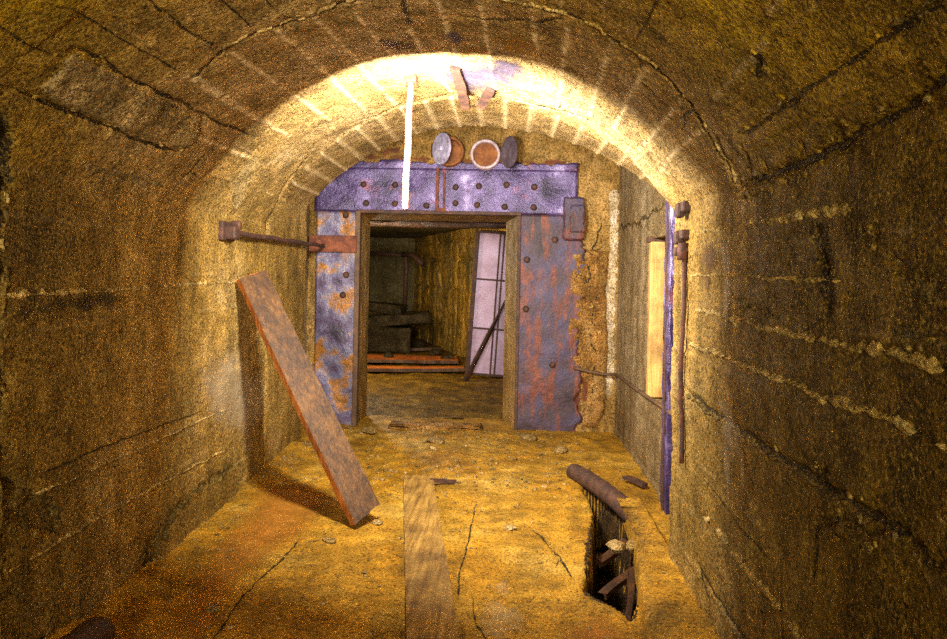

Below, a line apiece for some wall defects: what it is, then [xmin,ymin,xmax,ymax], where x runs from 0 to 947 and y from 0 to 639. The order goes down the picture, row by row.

crack [0,0,357,176]
rust [366,148,426,162]
damp [447,32,486,55]
damp [441,61,523,92]
crack [464,0,947,191]
crack [0,192,12,339]
crack [0,411,201,635]